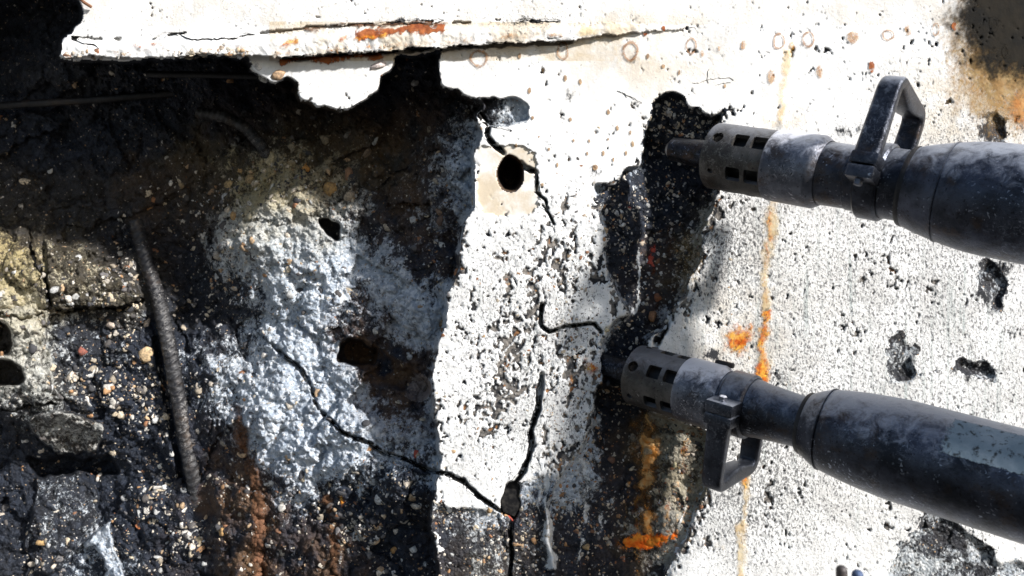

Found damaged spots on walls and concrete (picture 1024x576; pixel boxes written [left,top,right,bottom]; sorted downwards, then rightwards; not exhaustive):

corrosion [279,20,445,66]
water stain [945,0,1024,123]
crack [471,110,553,223]
spalling [0,0,729,576]
crack [539,304,601,334]
corrosion [726,273,771,382]
spalling [885,330,923,384]
spalling [976,257,1010,314]
corrosion [233,407,269,576]
crack [253,328,542,576]
corrosion [619,414,678,571]
spalling [887,512,1024,576]